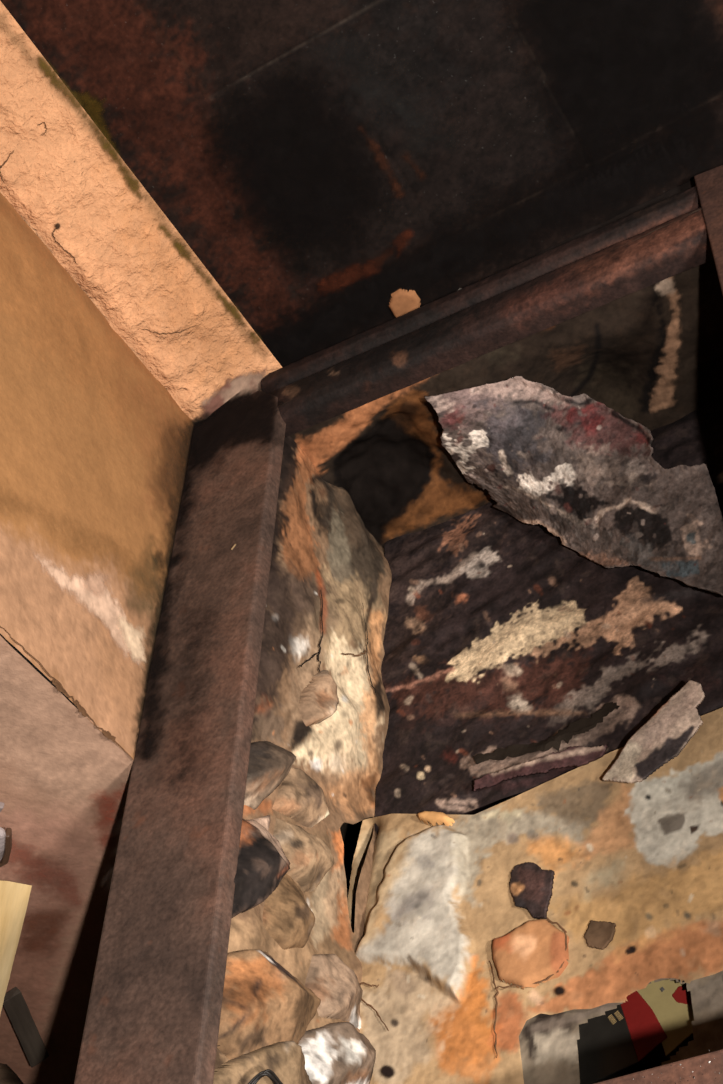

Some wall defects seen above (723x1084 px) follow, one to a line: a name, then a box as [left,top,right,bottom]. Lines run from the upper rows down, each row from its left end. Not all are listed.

damp [38,57,141,197]
damp [159,226,210,282]
damp [217,292,241,321]
rust [474,745,608,791]